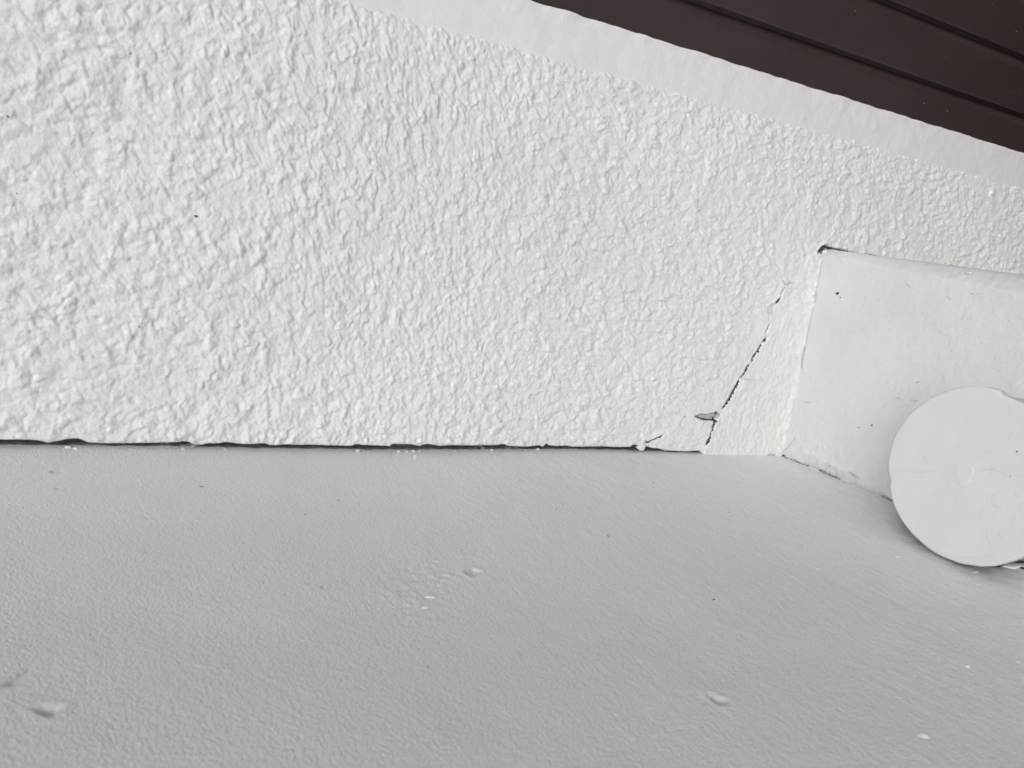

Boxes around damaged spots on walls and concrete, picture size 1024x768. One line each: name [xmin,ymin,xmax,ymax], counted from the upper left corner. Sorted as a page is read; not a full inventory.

spalling [695,412,720,421]
crack [706,245,877,445]